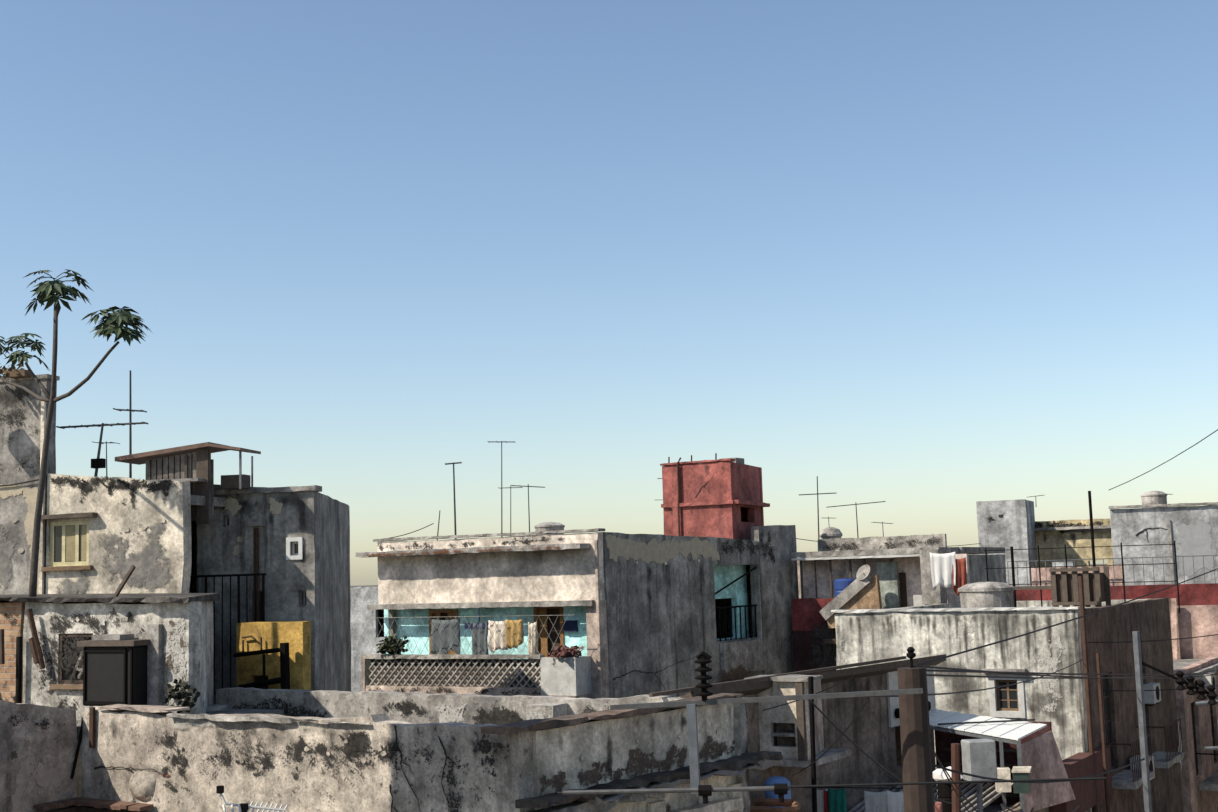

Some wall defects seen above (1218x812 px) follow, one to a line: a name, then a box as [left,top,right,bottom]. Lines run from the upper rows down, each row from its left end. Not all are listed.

peeling [0,483,39,594]
leakage [368,686,456,717]
leakage [155,727,446,790]
crack [389,725,456,812]
leakage [469,689,540,812]